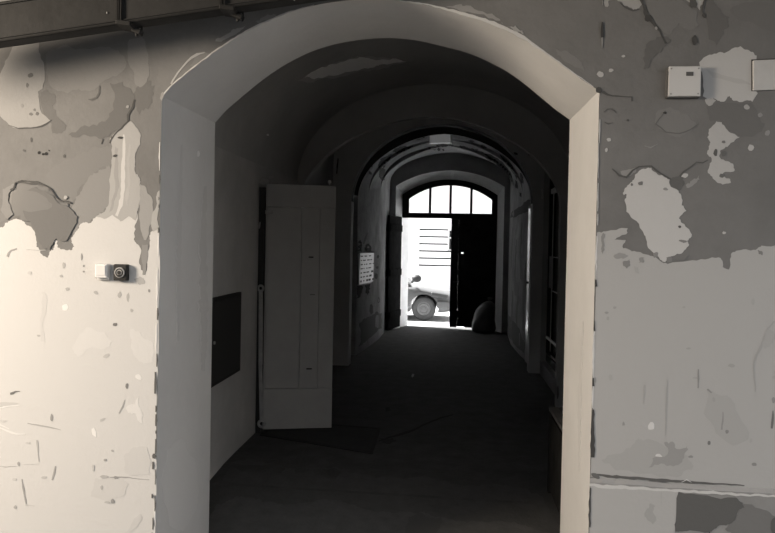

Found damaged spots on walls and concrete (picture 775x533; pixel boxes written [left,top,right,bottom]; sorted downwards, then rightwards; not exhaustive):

peeling [604,0,642,10]
flaking render [0,43,50,128]
peeling [699,46,758,109]
peeling [707,121,739,185]
flaking render [0,142,161,533]
flaking render [588,168,775,533]
crack [597,474,745,486]